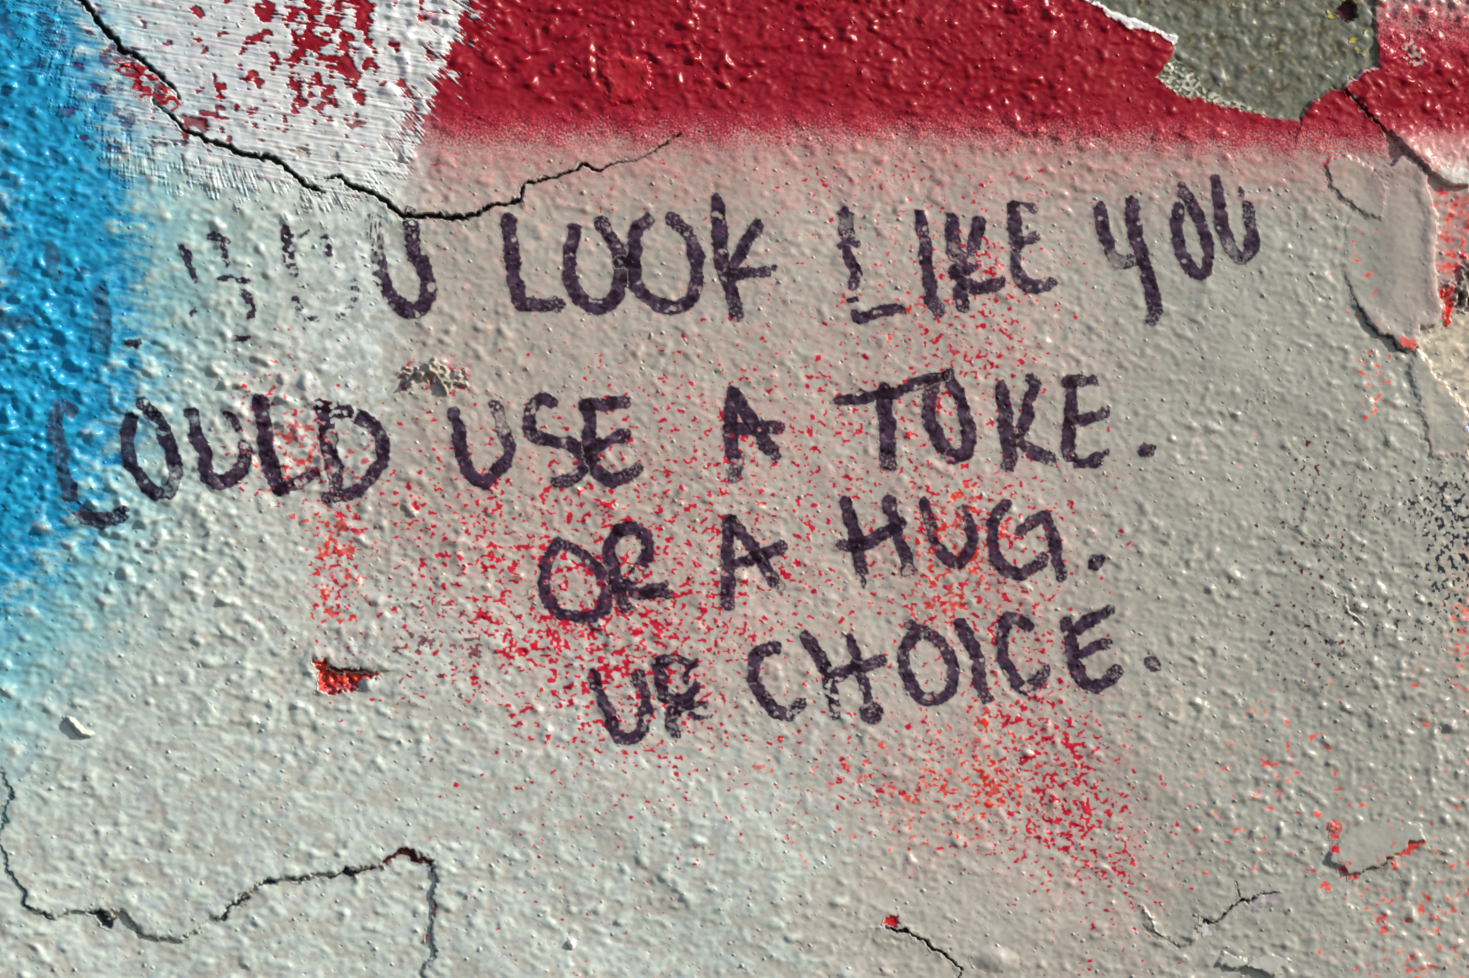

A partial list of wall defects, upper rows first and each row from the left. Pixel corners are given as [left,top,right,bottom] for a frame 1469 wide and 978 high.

crack [74,0,683,225]
peeling [1082,0,1382,122]
peeling [1320,124,1469,460]
crack [0,764,34,911]
peeling [1327,818,1428,882]
crack [418,863,440,978]
crack [903,927,965,978]
crack [1140,879,1278,951]